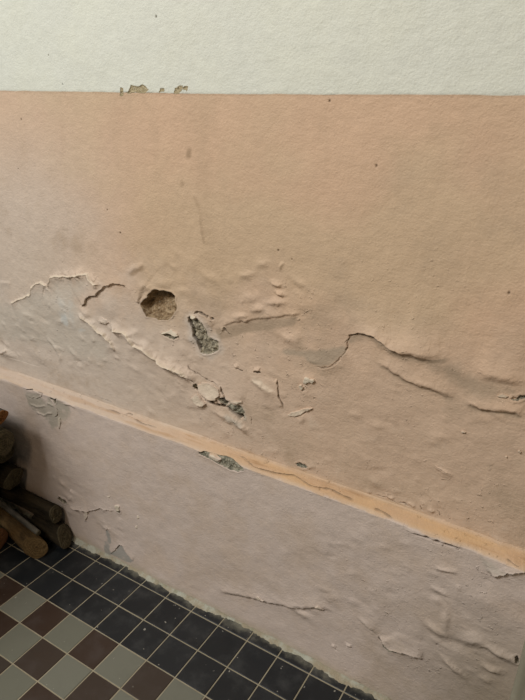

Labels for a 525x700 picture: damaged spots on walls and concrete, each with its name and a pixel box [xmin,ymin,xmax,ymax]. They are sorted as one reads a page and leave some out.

peeling [118,80,192,99]
flaking render [78,278,266,439]
flaking render [19,380,76,437]
flaking render [194,443,248,475]